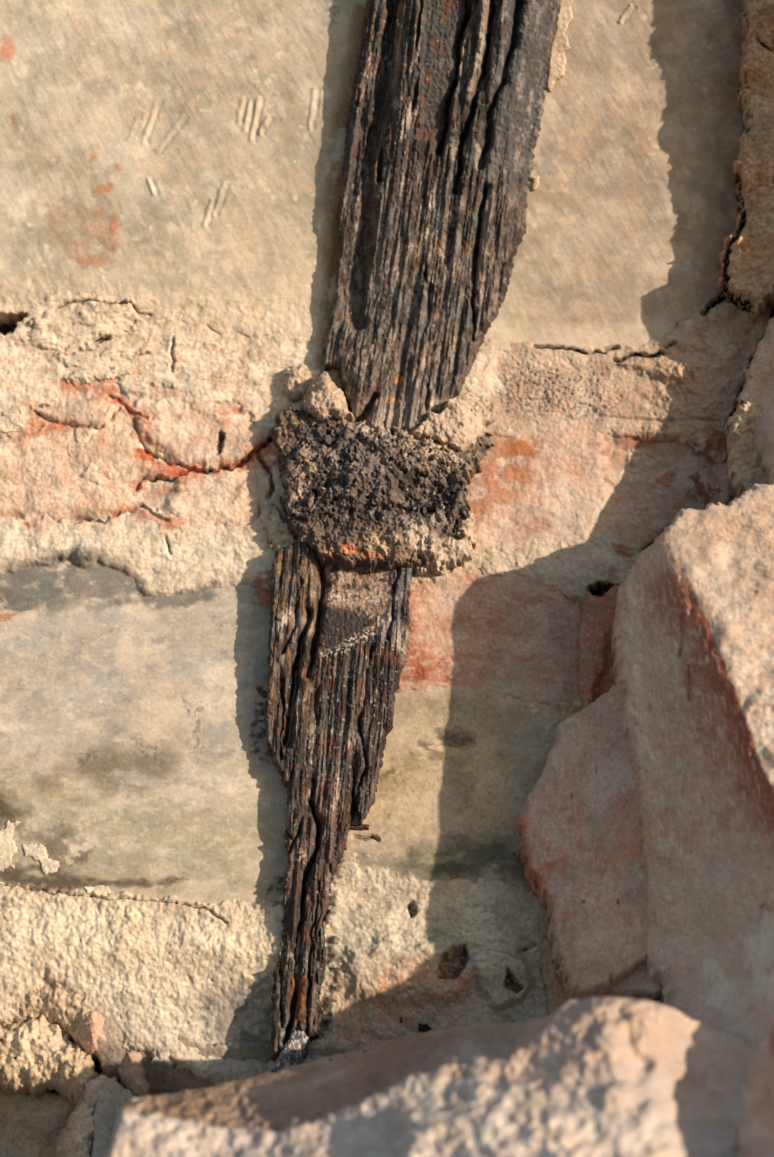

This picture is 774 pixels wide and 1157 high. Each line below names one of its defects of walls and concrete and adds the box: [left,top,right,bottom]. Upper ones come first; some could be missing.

crack [55,299,151,316]
crack [604,179,768,422]
crack [540,344,675,363]
crack [30,396,275,554]
leakage [0,550,213,611]